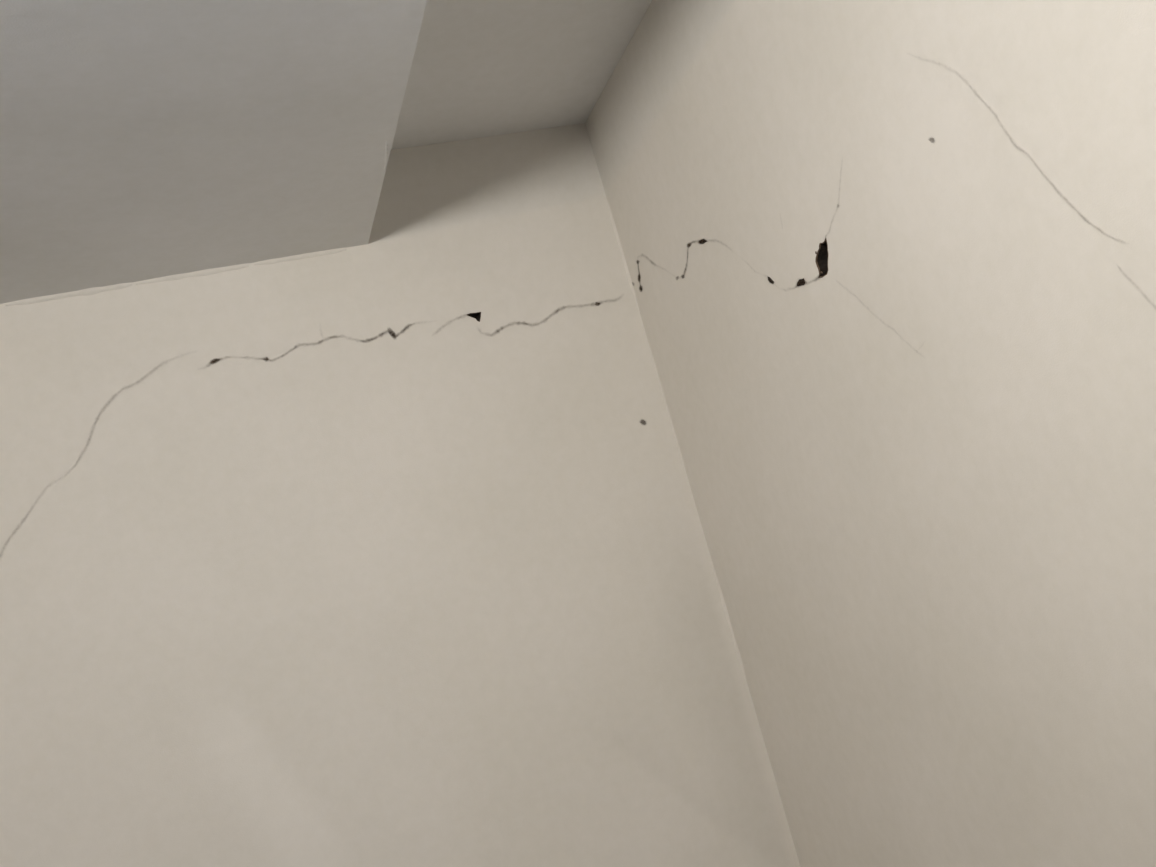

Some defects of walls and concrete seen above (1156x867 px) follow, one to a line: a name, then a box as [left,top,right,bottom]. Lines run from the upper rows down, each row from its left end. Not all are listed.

crack [767,276,820,286]